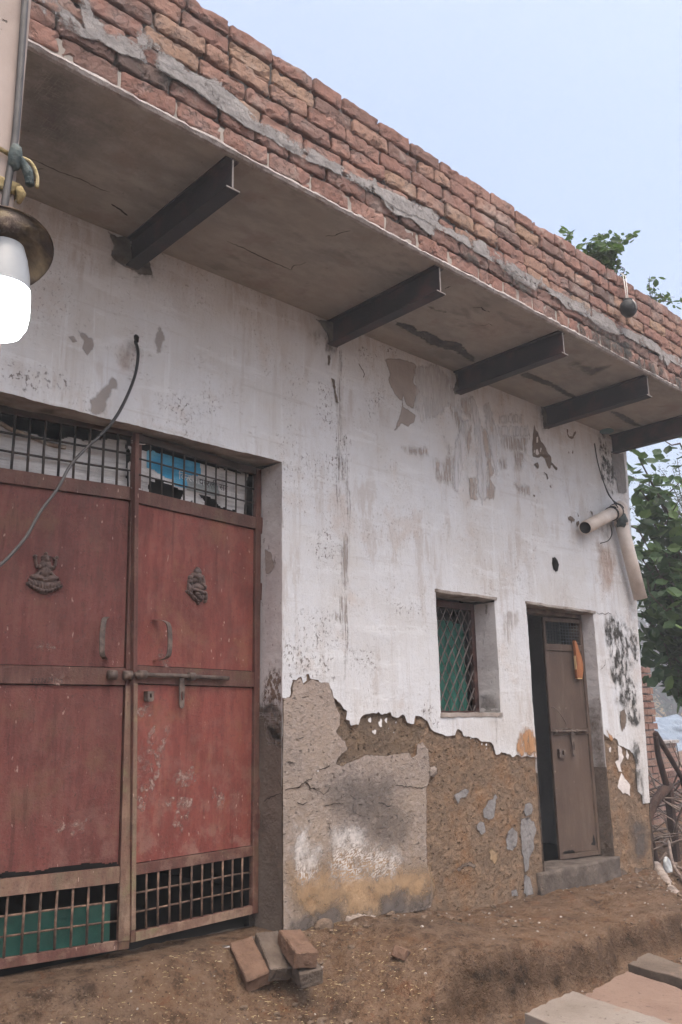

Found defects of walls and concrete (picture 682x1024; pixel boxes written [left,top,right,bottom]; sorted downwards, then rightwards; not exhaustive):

peeling [91,378,117,415]
peeling [358,347,419,430]
peeling [450,400,558,500]
water stain [605,617,640,725]
flaking render [254,645,543,932]
peeling [602,710,653,885]